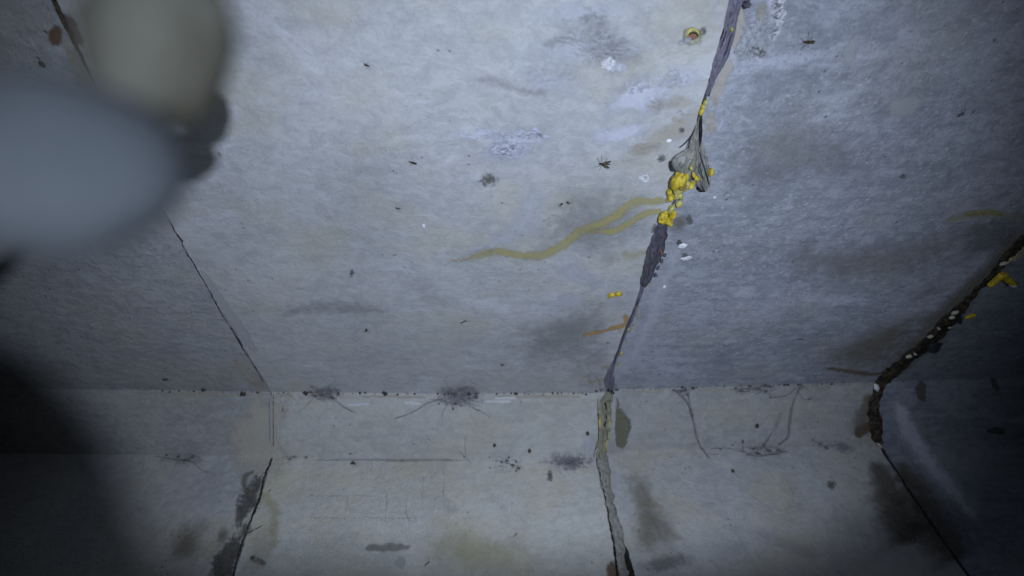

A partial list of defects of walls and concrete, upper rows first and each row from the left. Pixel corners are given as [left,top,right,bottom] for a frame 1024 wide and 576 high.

water stain [472,192,665,258]
crack [169,221,263,381]
crack [233,458,273,576]
crack [594,402,619,576]
crack [881,444,969,576]